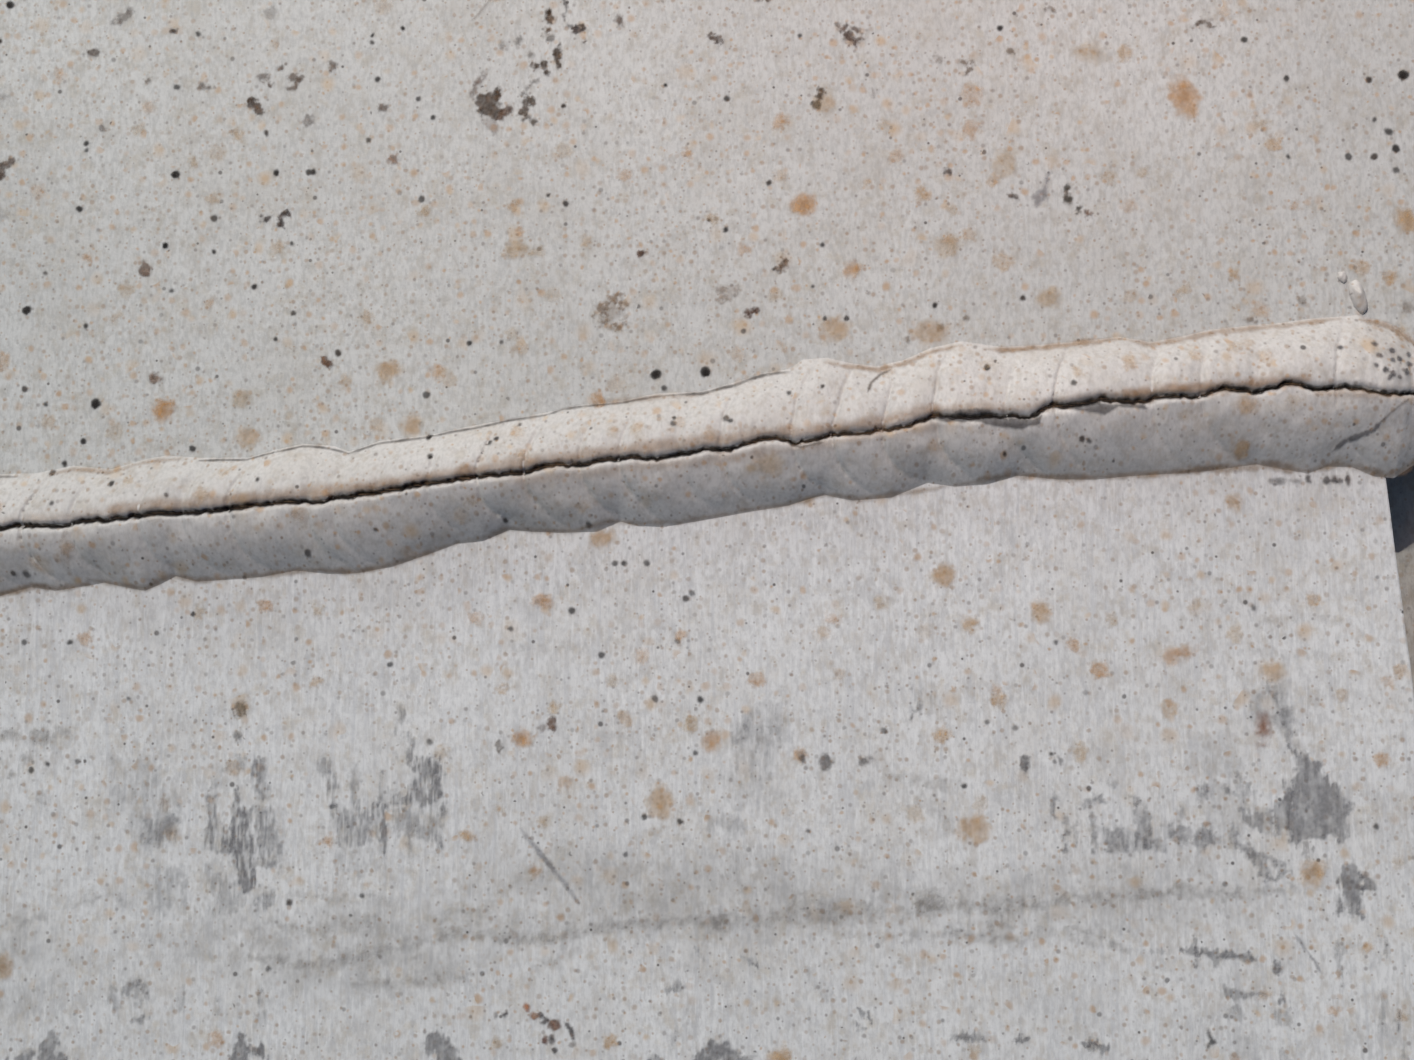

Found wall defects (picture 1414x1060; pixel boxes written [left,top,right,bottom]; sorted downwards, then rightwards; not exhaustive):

crack [0,380,1414,531]
crack [691,372,779,394]